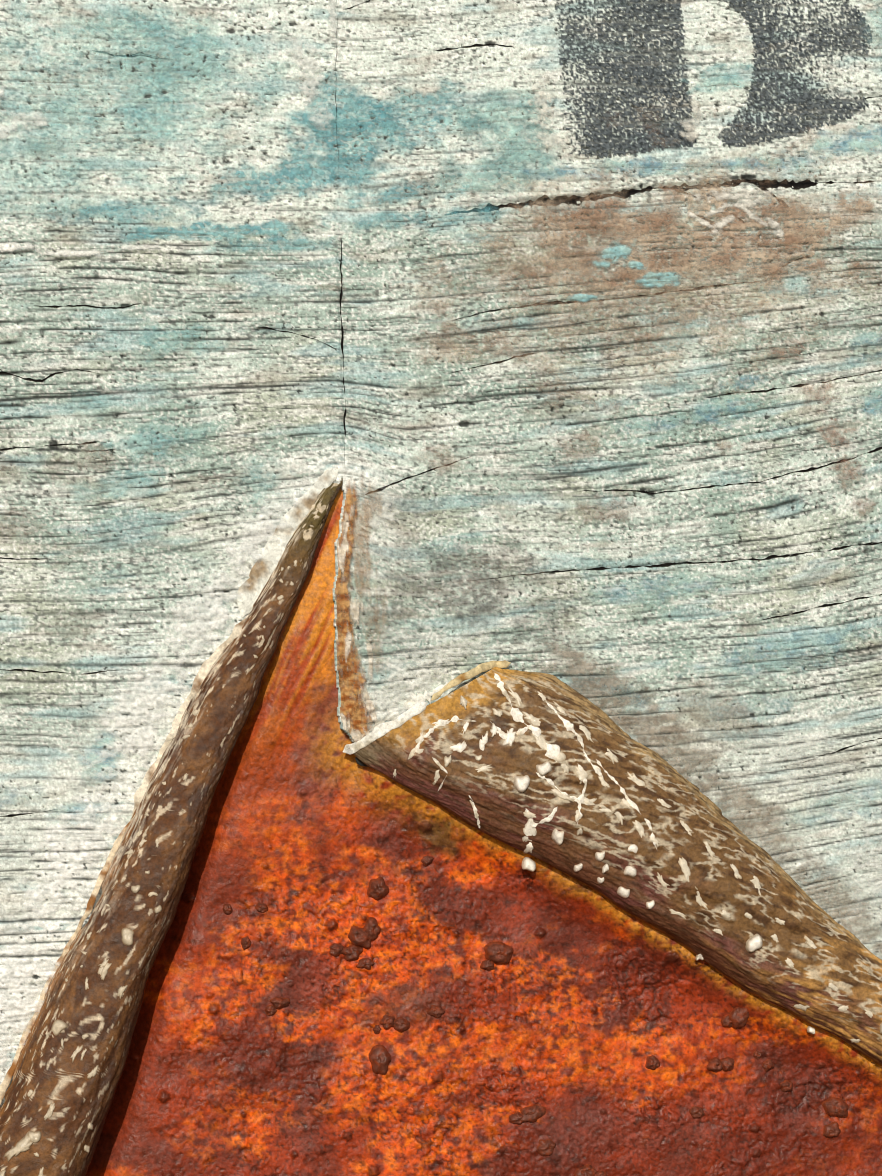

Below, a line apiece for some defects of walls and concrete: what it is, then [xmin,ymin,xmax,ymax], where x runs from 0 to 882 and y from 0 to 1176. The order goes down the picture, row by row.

crack [445,179,873,231]
peeling [337,508,354,572]
corrosion [335,488,372,742]
peeling [345,598,363,656]
peeling [0,467,343,1176]
peeling [341,660,882,1066]